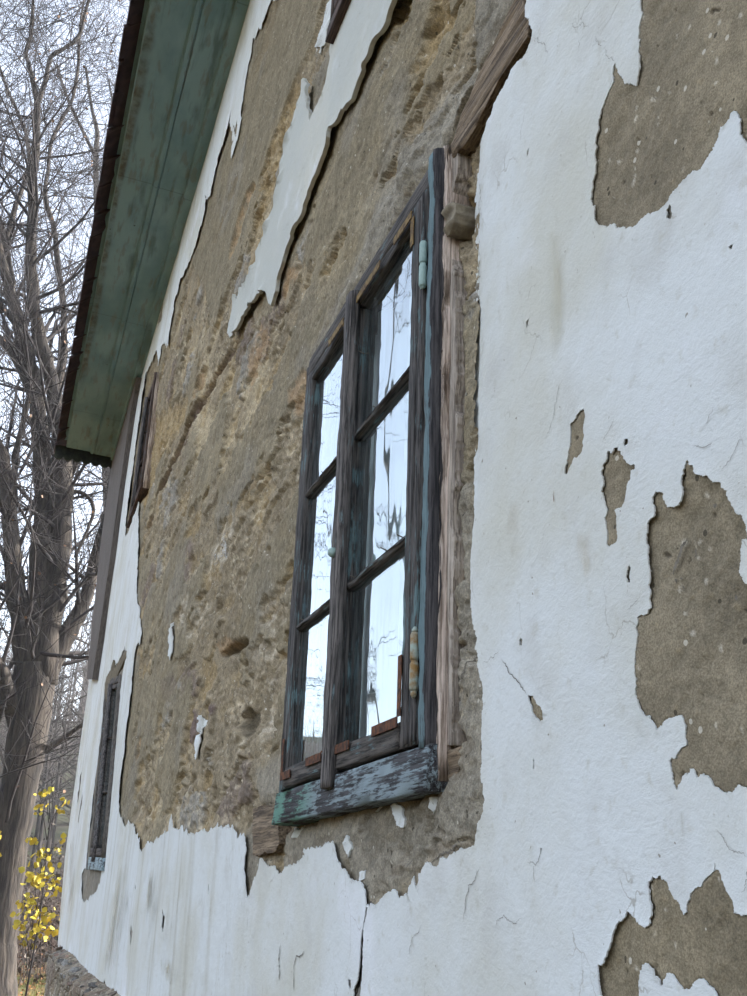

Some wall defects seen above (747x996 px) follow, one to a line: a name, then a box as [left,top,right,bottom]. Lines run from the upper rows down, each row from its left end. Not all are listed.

flaking render [592,0,747,228]
flaking render [109,0,514,905]
flaking render [566,410,585,474]
flaking render [602,439,635,546]
flaking render [635,461,747,792]
flaking render [77,739,102,902]
crack [355,901,371,996]
flaking render [599,870,747,996]